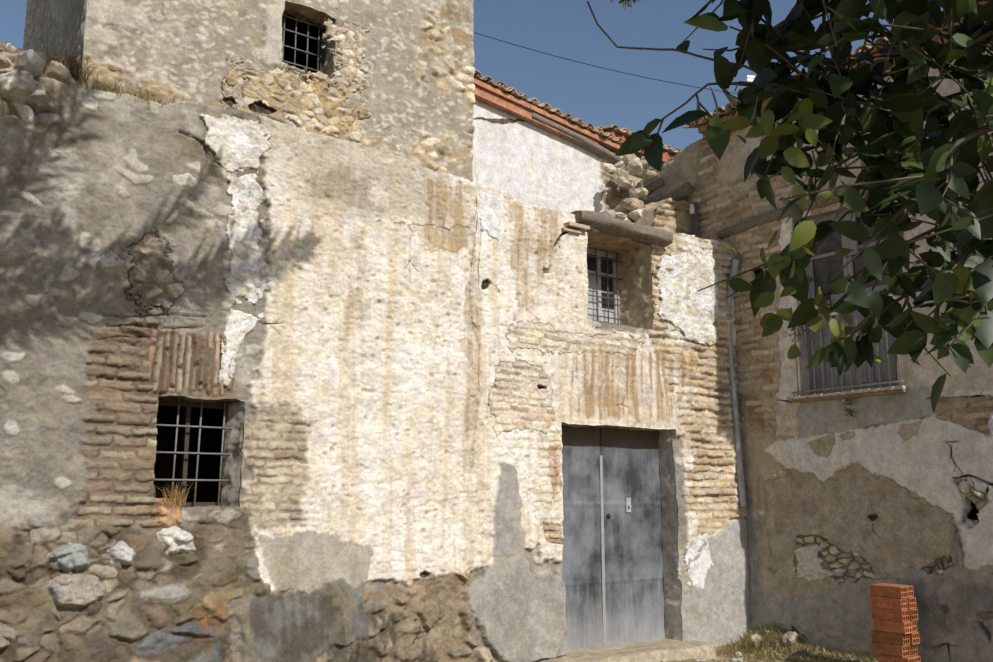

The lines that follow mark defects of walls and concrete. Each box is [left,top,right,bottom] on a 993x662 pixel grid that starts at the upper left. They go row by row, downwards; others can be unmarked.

spalling [199,14,374,387]
peeling [654,248,720,346]
peeling [892,421,922,441]
spalling [930,394,993,436]
crack [949,441,993,503]
peeling [759,463,993,583]